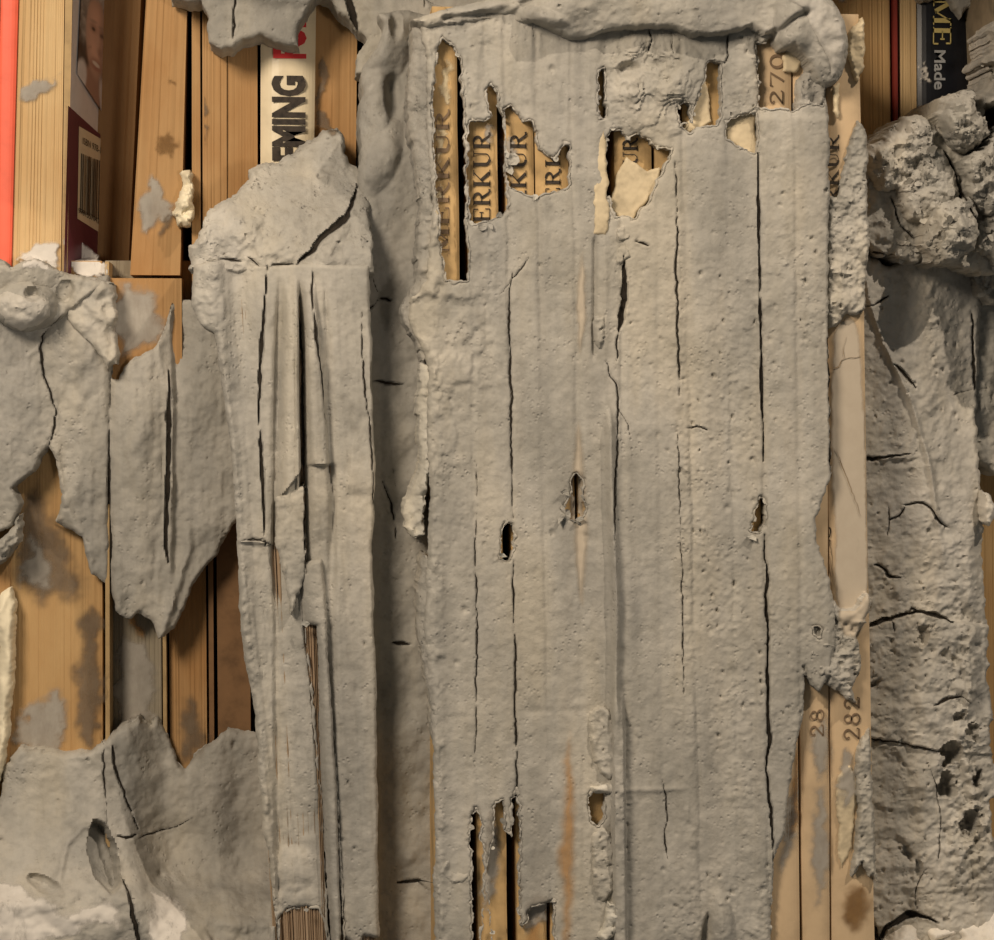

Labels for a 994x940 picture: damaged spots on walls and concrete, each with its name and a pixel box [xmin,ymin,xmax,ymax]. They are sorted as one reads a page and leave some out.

spalling [430,36,572,285]
spalling [676,38,826,155]
crack [201,186,358,560]
crack [607,241,649,541]
crack [673,174,681,389]
crack [756,179,764,460]
spalling [498,520,517,561]
spalling [558,473,588,526]
crack [763,541,774,846]
spalling [333,731,346,940]
spalling [468,787,557,940]
crack [871,738,941,940]